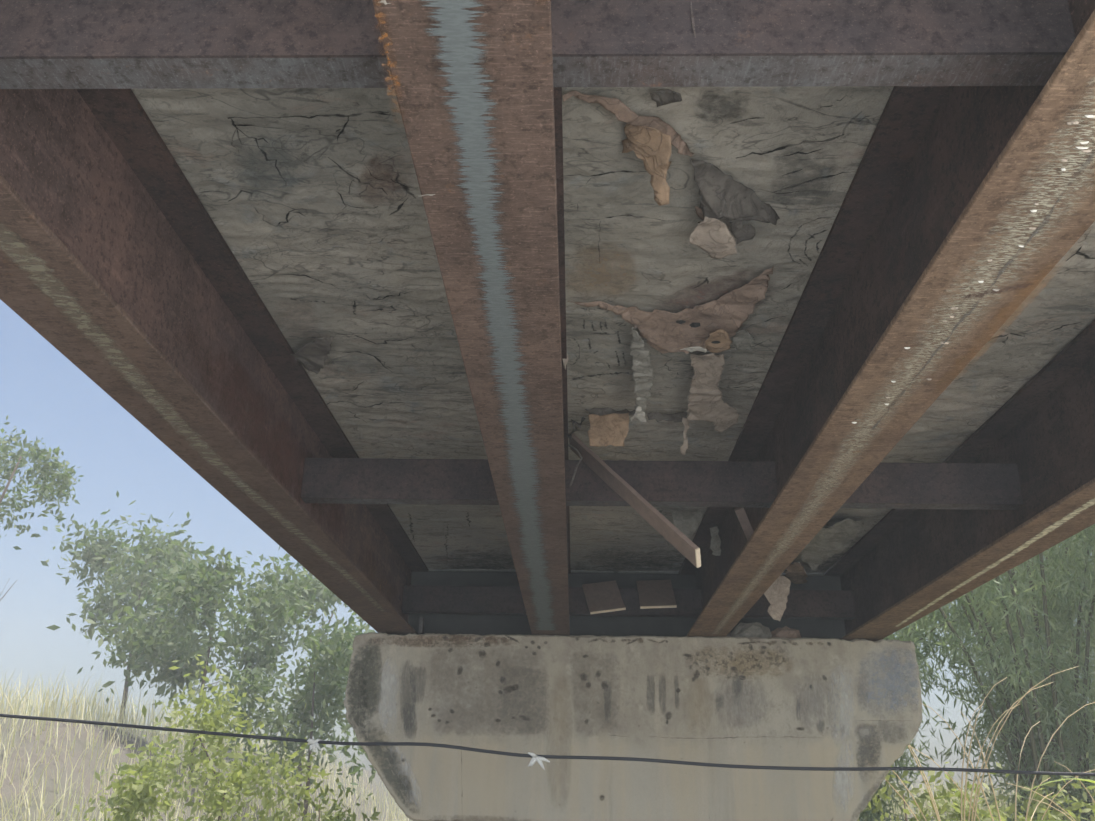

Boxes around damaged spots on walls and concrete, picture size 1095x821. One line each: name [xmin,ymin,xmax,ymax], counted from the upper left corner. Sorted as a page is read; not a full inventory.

corrosion [375,2,400,112]
crack [200,190,303,224]
crack [228,103,415,215]
water stain [348,646,417,810]